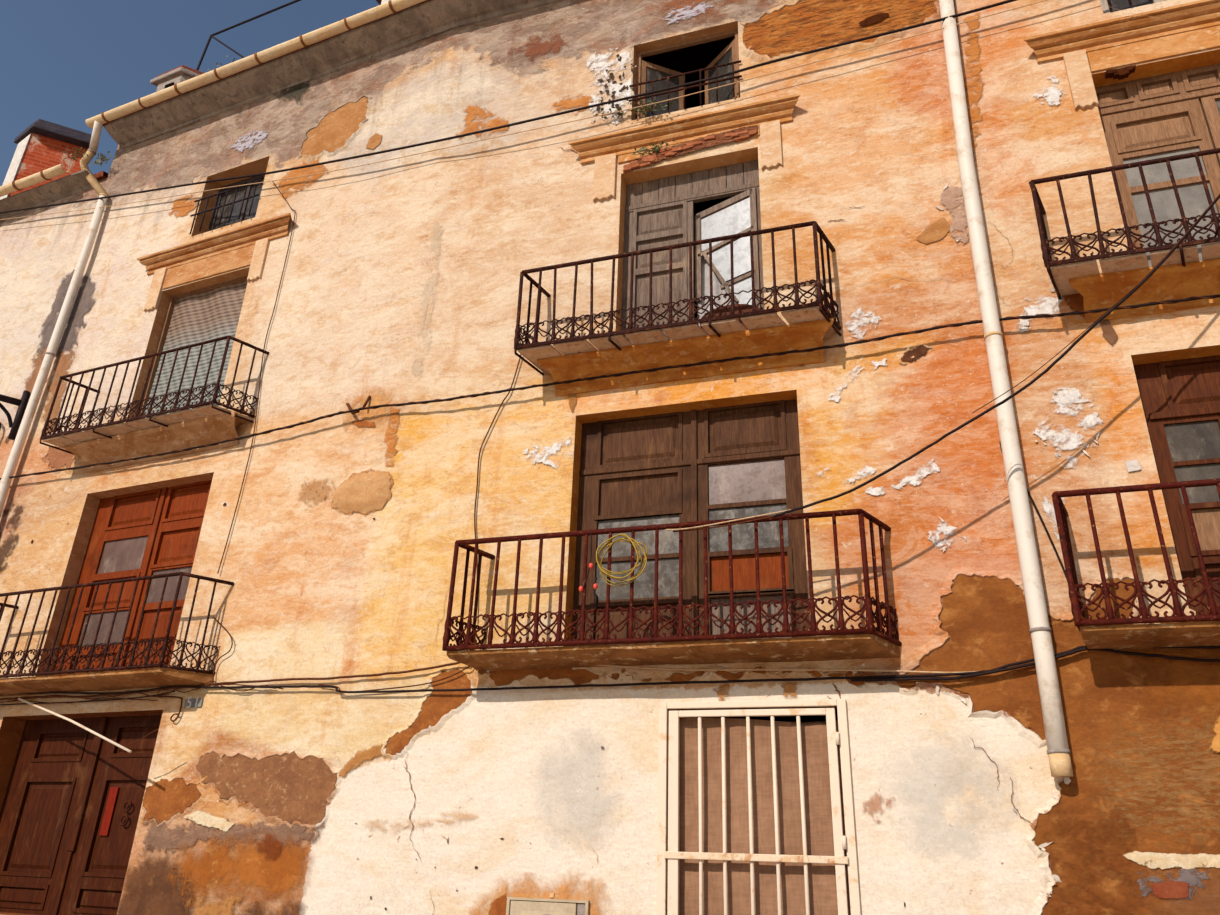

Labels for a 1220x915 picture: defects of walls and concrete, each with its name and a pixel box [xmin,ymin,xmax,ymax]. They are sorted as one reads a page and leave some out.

peeling [553,44,637,125]
flaking render [740,0,941,65]
flaking render [273,93,382,198]
water stain [20,269,96,436]
peeling [1033,387,1109,469]
flaking render [140,566,1047,832]
flaking render [1025,571,1220,915]
crack [403,755,421,860]
water stain [116,818,325,915]